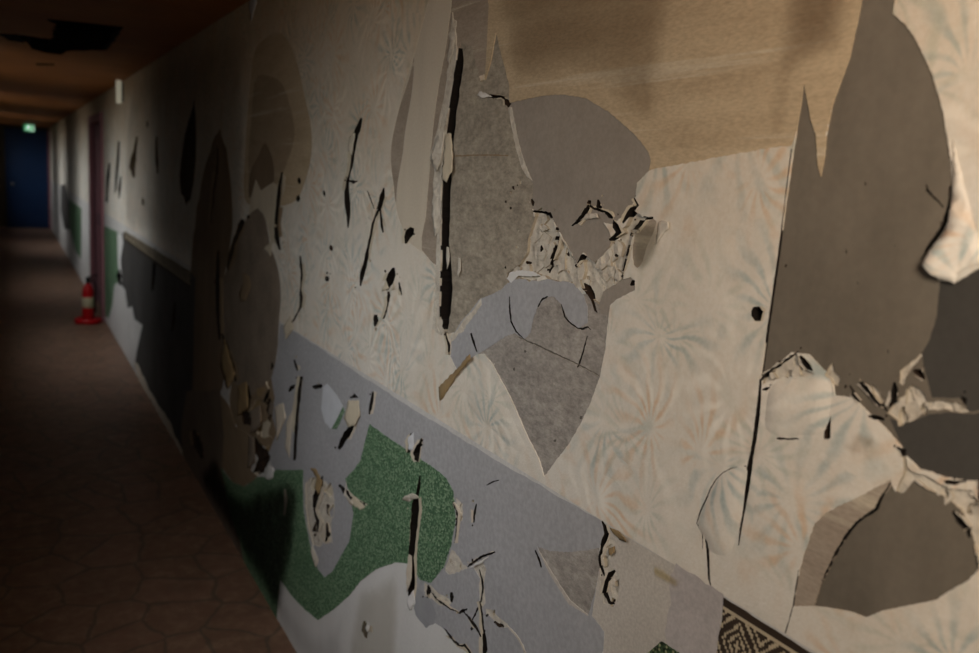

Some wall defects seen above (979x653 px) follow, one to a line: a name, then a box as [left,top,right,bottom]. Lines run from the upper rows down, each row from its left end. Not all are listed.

crack [342,118,388,289]
peeling [121,32,724,653]
crack [430,12,477,355]
peeling [391,0,979,617]
crack [696,149,813,586]
crack [785,570,799,633]